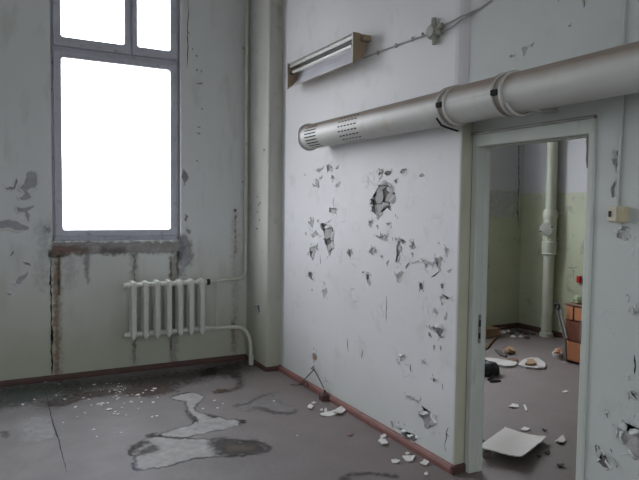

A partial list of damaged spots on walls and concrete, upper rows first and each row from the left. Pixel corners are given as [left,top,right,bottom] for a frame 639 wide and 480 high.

peeling [0,170,41,233]
peeling [368,168,452,282]
crack [46,392,67,471]
damp [0,361,269,470]
peeling [612,415,639,460]